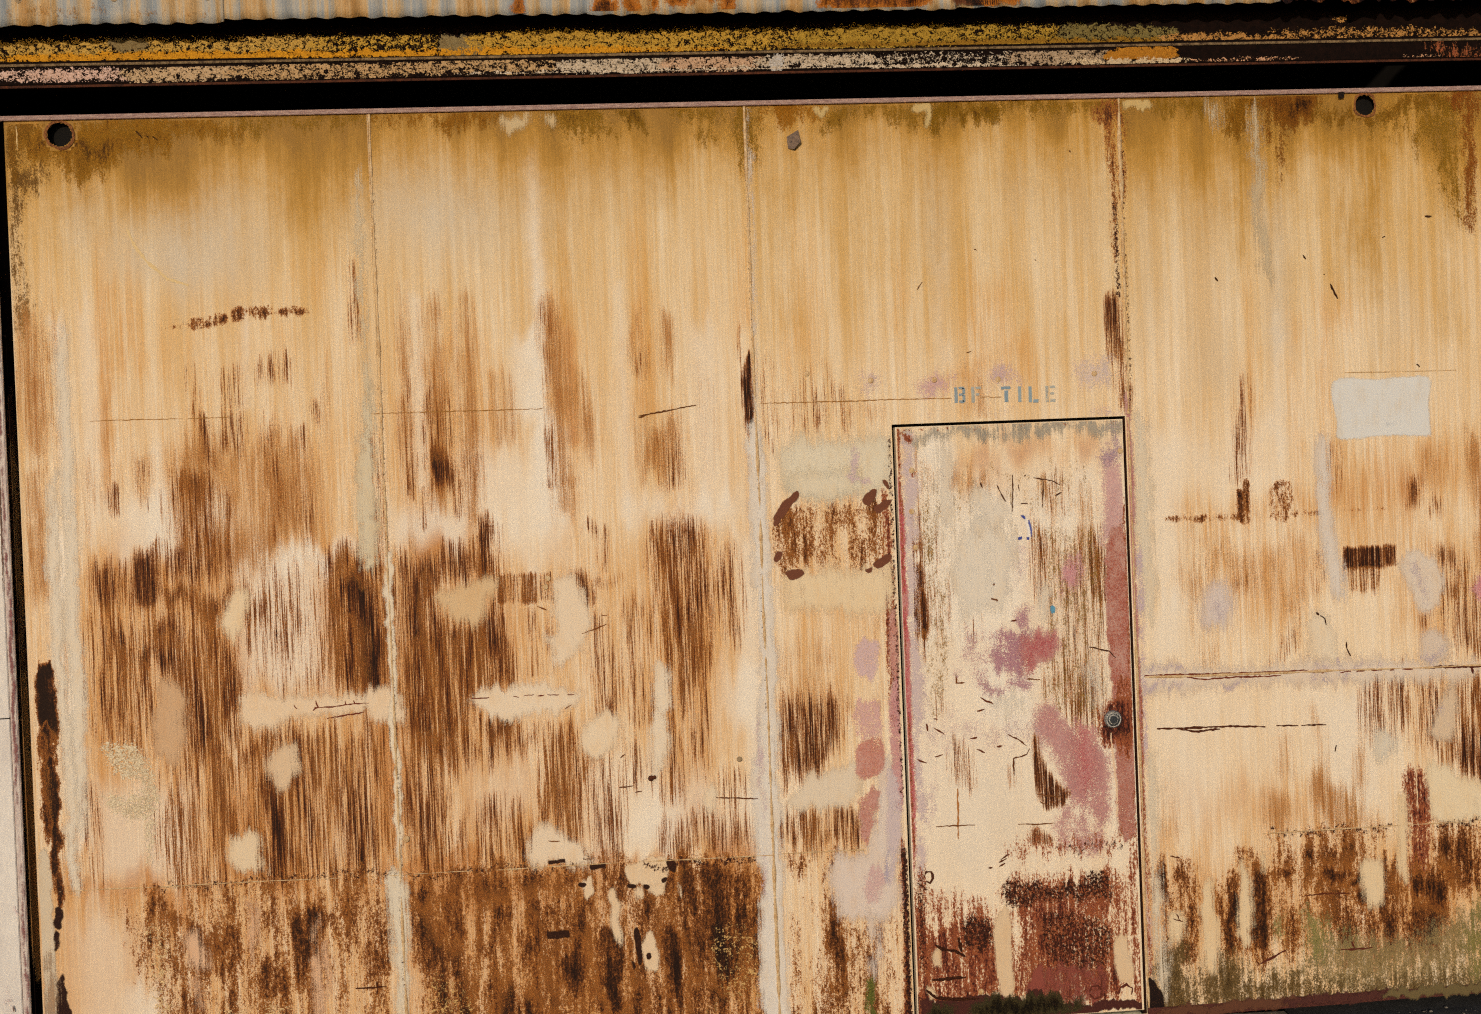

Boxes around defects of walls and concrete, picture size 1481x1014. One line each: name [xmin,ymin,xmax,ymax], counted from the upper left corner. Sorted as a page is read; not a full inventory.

corrosion [589,0,736,11]
corrosion [815,0,932,8]
corrosion [1425,41,1481,57]
corrosion [348,260,361,339]
corrosion [1091,99,1133,424]
peeling [774,552,805,580]
corrosion [0,292,1481,1014]
peeling [845,354,1186,977]